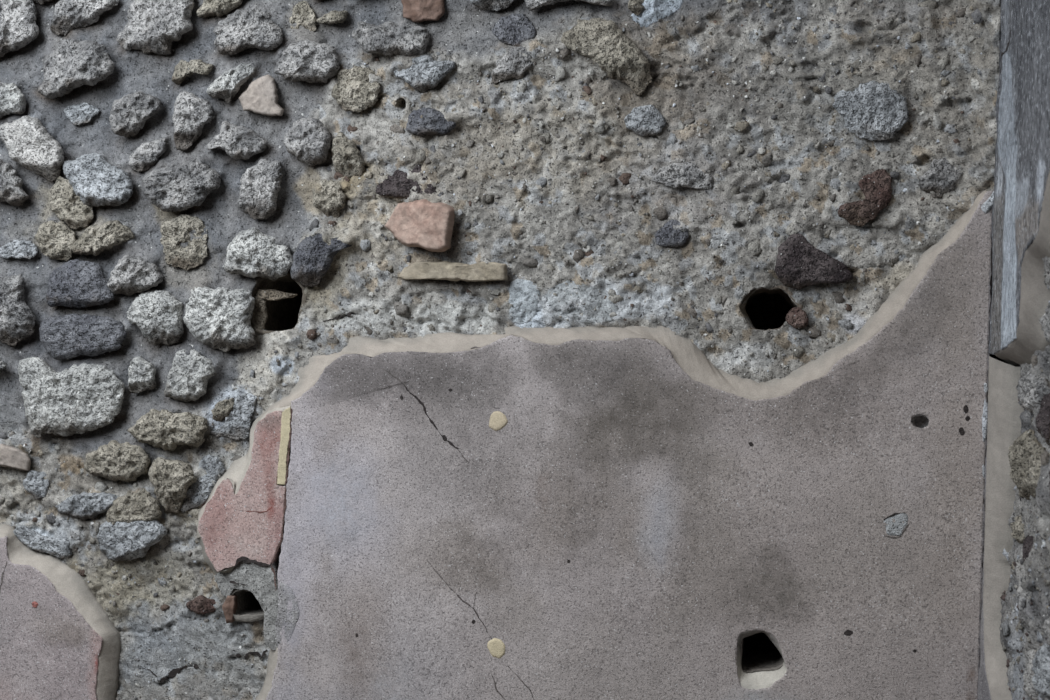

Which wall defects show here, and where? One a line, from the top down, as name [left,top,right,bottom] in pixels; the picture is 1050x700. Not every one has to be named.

crack [383,369,469,463]
spalling [959,383,988,442]
spalling [993,256,1050,700]
spalling [884,512,910,538]
spalling [214,551,300,651]
crack [426,559,492,639]
crack [491,666,534,700]
spalling [736,630,787,690]